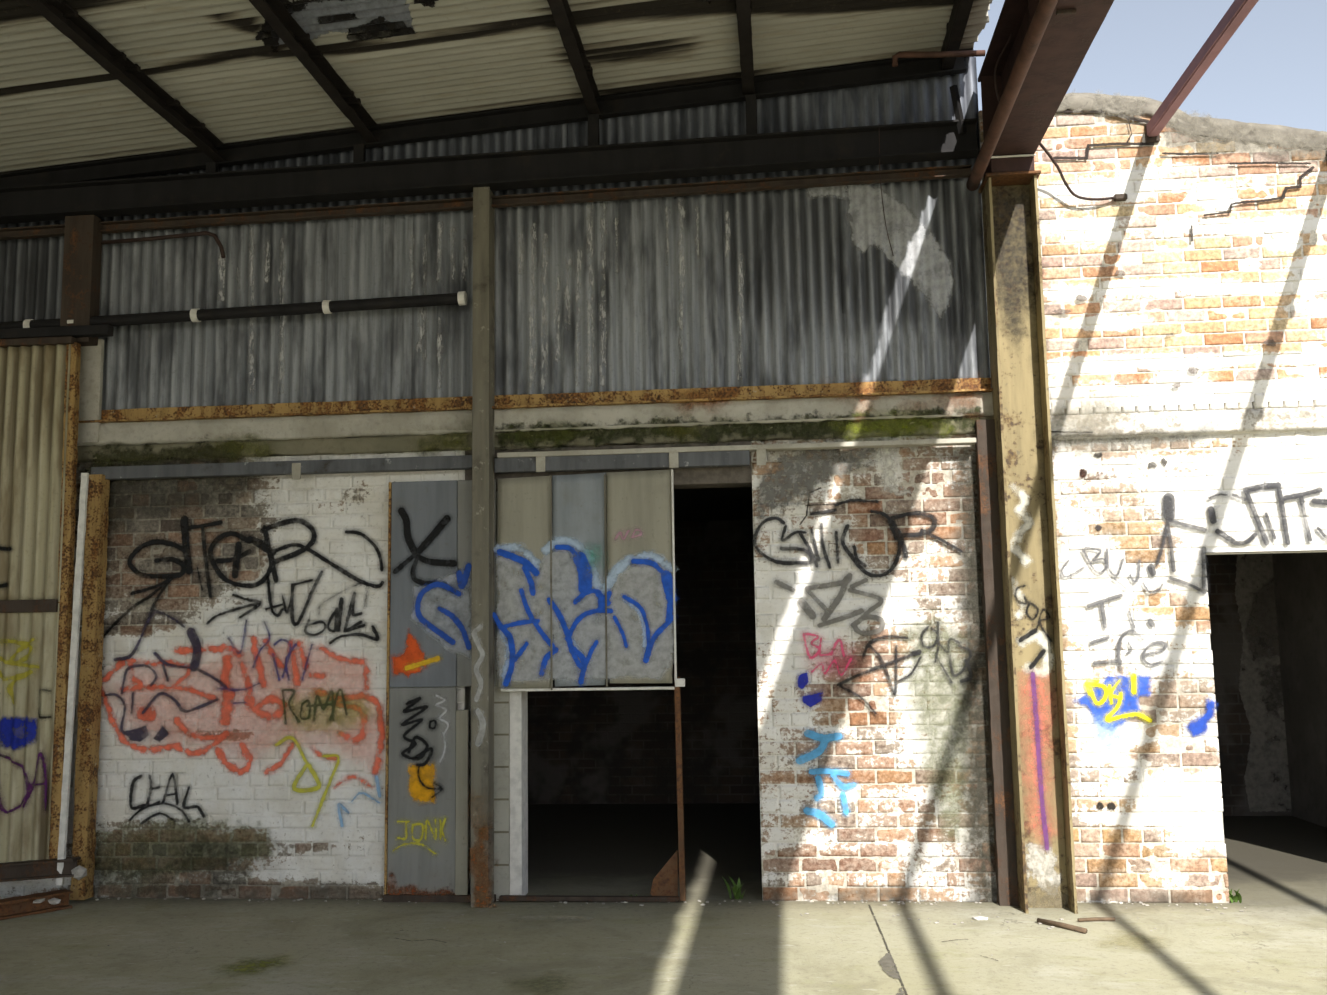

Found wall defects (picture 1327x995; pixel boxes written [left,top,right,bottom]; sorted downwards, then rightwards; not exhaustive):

peeling [289,0,414,40]
crack [1053,109,1314,242]
rust [953,386,976,406]
rust [384,482,455,895]